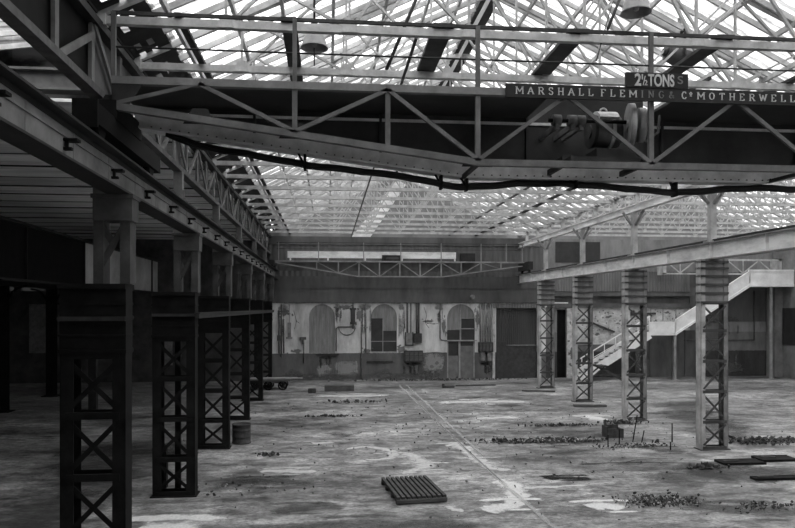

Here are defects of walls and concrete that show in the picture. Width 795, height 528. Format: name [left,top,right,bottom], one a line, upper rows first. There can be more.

damp [285,361,436,380]